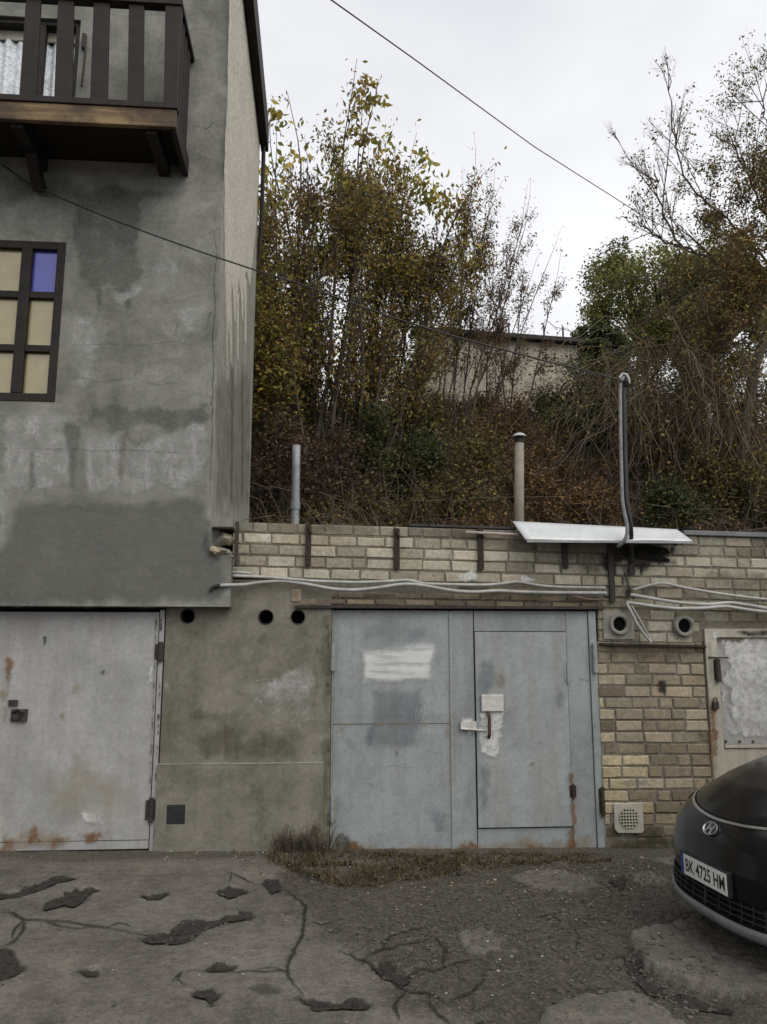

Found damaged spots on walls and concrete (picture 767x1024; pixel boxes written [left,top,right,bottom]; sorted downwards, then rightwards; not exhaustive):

water stain [1,406,207,516]
peeling [712,632,767,737]
corrosion [555,800,586,848]